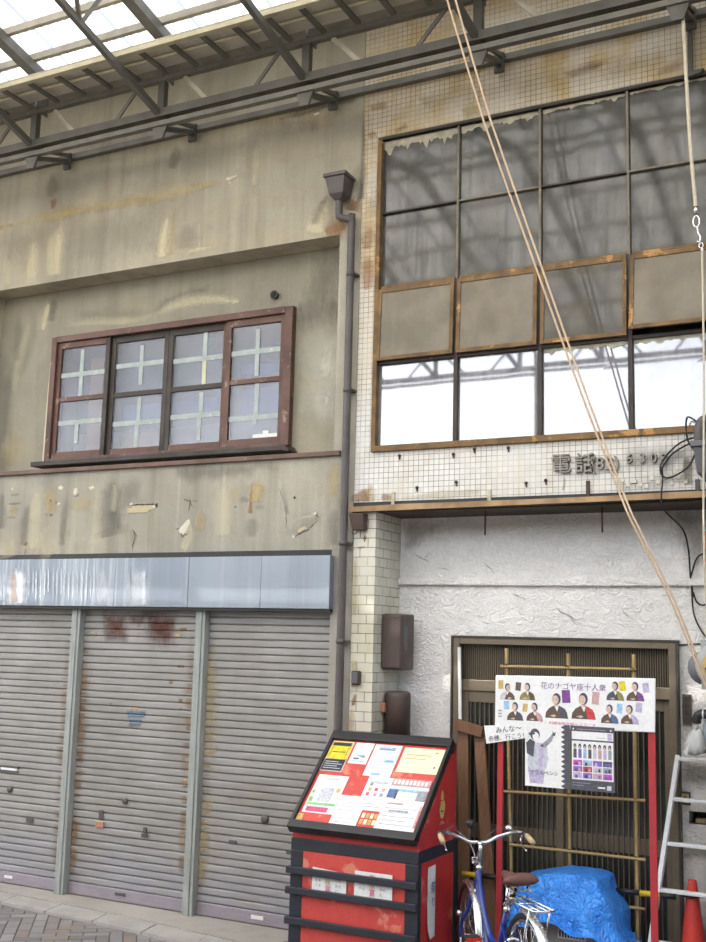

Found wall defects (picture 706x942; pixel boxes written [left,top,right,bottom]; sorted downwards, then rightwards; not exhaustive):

spalling [178,519,190,538]
rust [149,617,186,642]